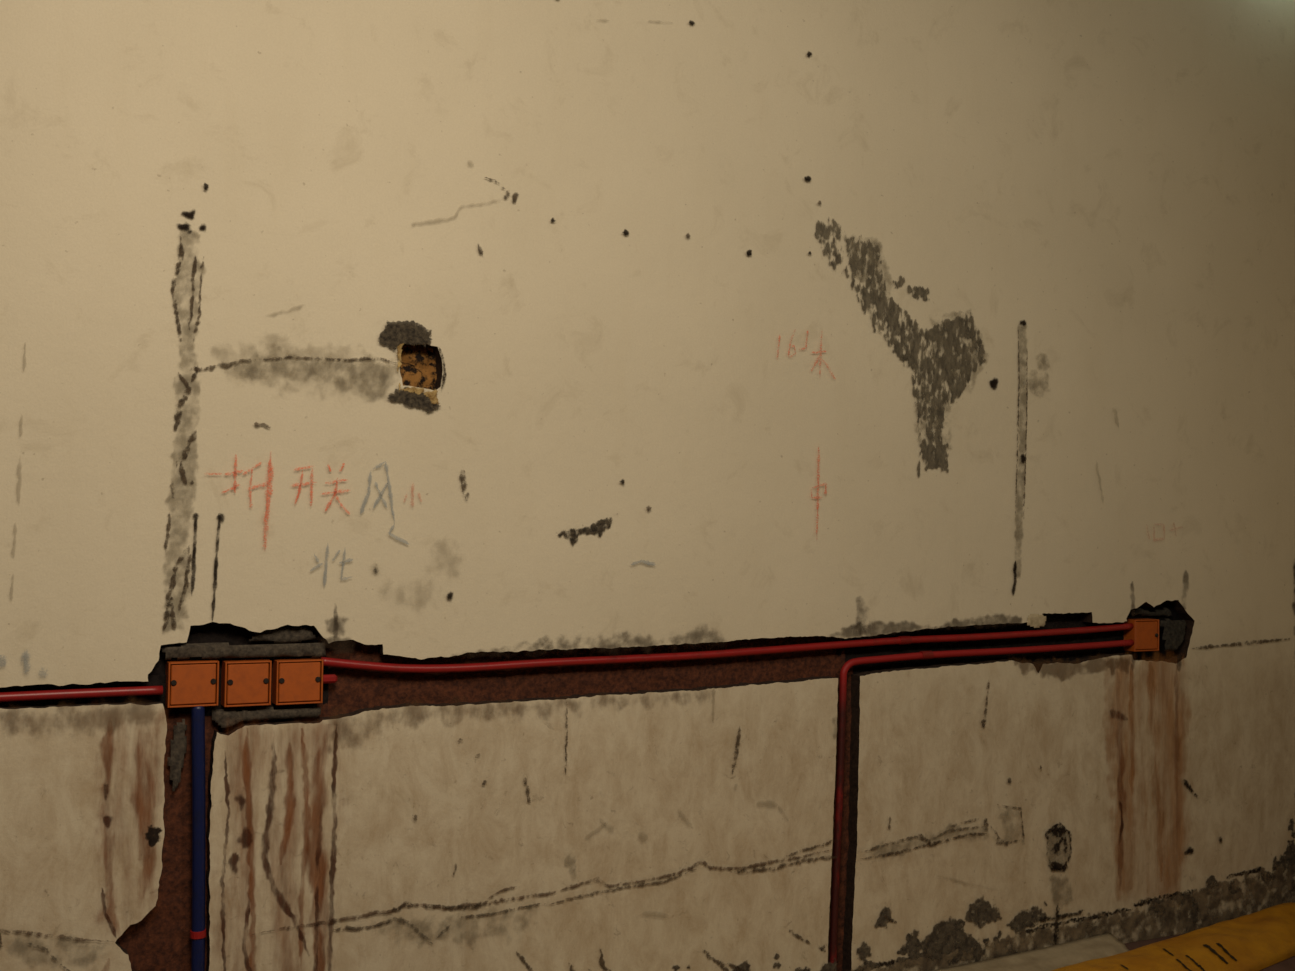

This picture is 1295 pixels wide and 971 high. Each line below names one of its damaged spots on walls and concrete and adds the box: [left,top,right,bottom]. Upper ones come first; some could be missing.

spalling [378,320,447,412]
peeling [558,517,612,545]
rust [137,794,162,869]
rust [224,730,337,971]
crack [261,804,1025,944]